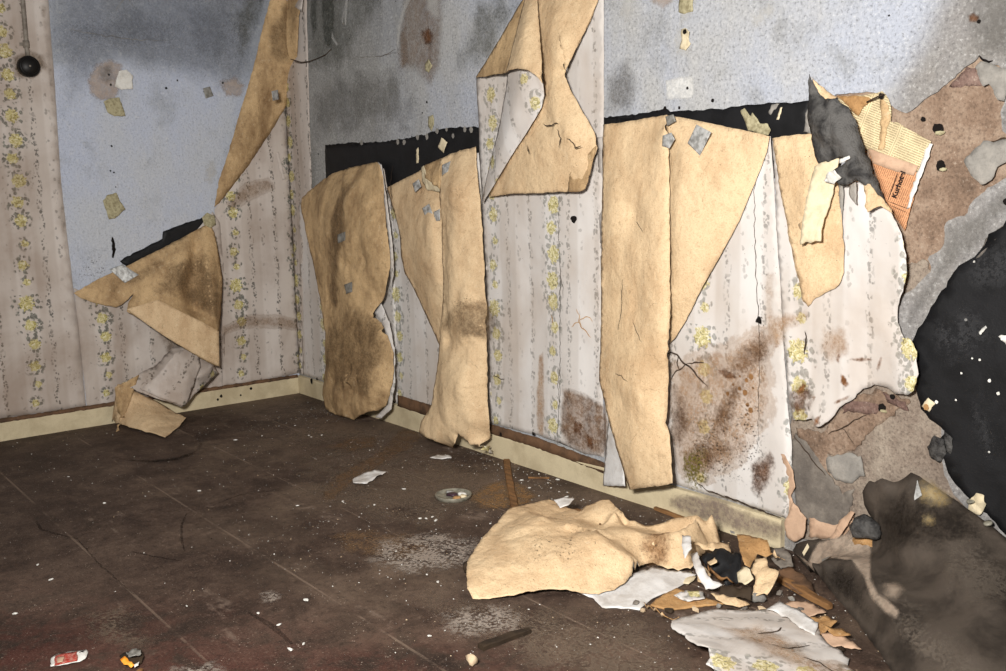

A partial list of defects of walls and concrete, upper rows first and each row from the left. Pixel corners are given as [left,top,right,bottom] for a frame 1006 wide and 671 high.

spalling [891,57,1006,294]
damp [562,391,606,452]
damp [675,317,790,489]
spalling [790,375,965,540]